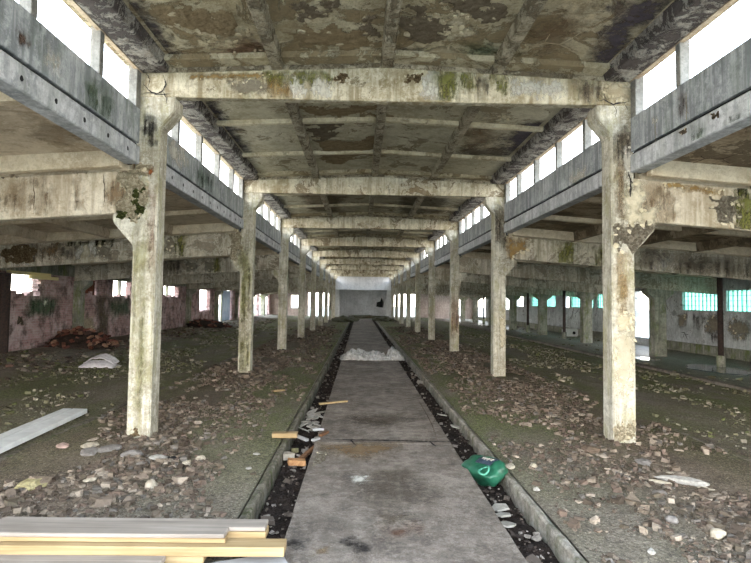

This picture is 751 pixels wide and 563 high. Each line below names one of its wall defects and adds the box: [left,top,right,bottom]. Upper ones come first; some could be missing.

leakage [587,0,673,63]
leakage [218,43,265,53]
crack [143,75,172,101]
spalling [332,73,349,84]
spalling [404,73,424,84]
leakage [421,71,562,100]
leakage [142,116,158,145]
spalling [114,162,153,223]
spalling [613,142,660,255]
spalling [662,182,743,229]
spalling [0,244,37,265]